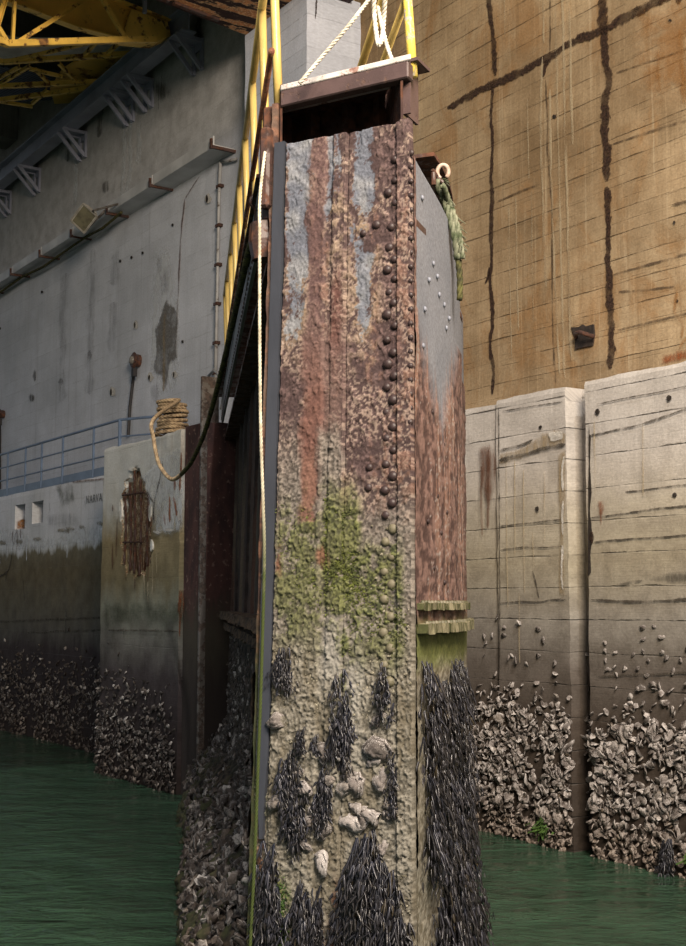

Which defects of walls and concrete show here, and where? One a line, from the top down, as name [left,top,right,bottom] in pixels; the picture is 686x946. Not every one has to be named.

spalling [148,254,179,392]
crack [447,0,686,669]
spalling [119,454,183,578]